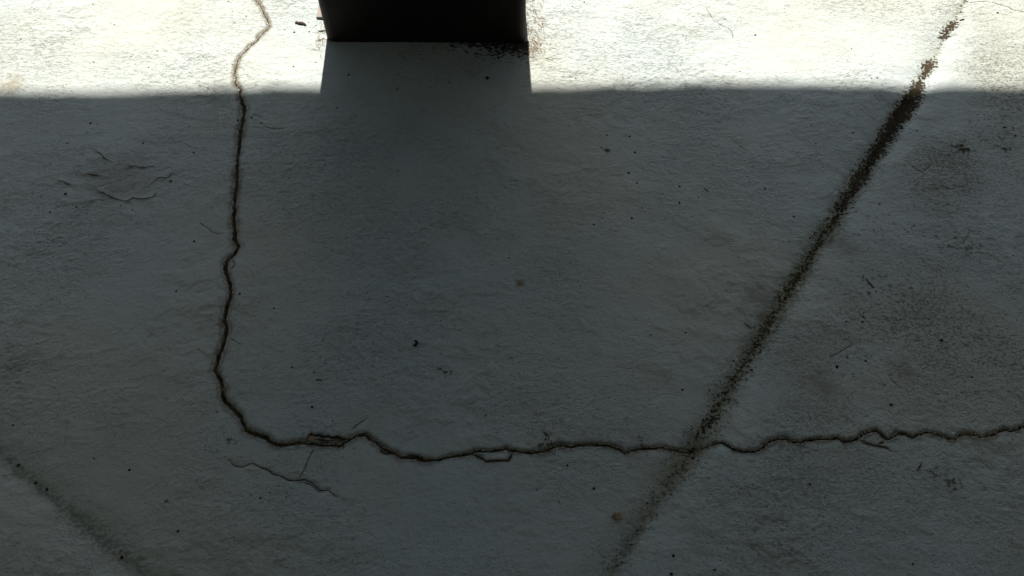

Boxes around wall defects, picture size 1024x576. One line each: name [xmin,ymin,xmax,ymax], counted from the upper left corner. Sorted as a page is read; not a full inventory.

crack [200,0,1024,494]